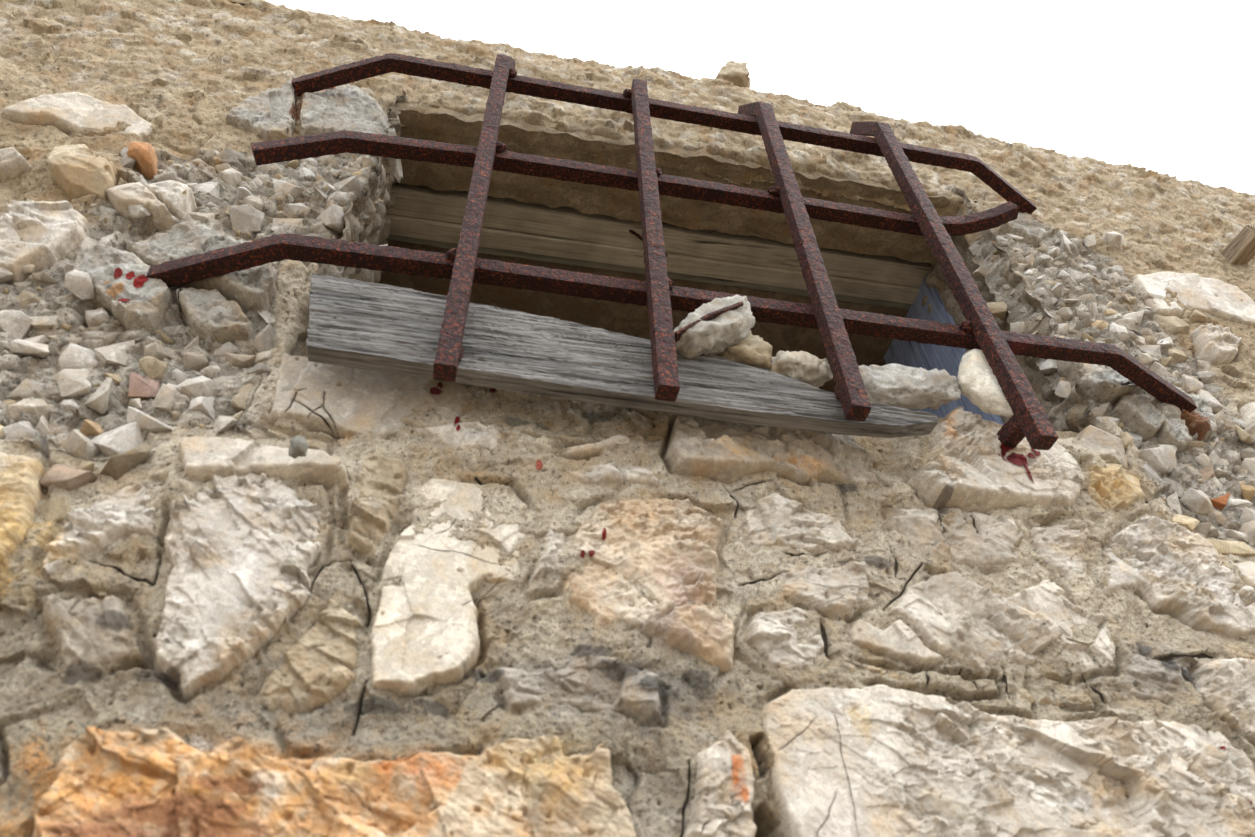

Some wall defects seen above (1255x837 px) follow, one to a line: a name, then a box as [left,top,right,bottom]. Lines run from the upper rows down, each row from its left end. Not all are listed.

rust [289,93,304,120]
rust [1181,410,1211,441]
crack [310,561,371,627]
crack [353,681,368,735]
crack [680,761,690,837]